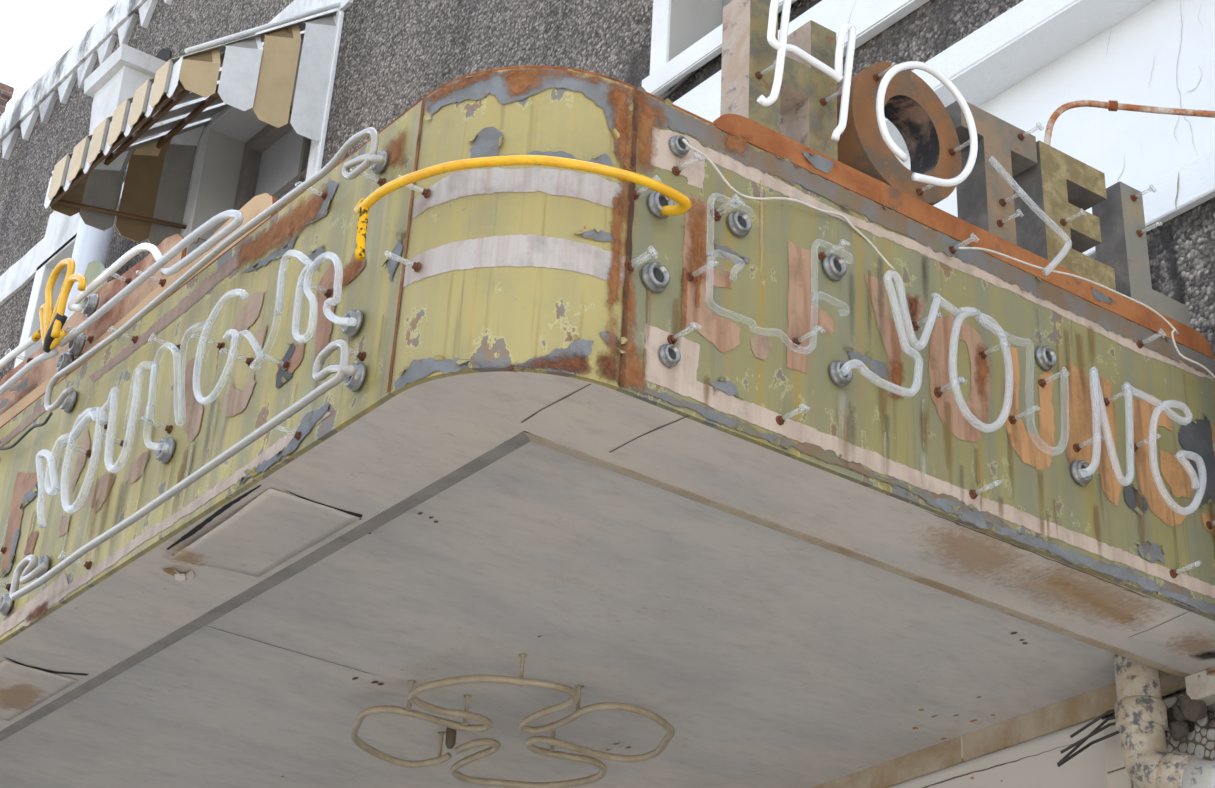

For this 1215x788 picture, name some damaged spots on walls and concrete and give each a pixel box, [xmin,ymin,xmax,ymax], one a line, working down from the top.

corrosion [427,68,667,389]
peeling [423,69,1215,380]
corrosion [907,297,918,323]
peeling [394,331,627,392]
peeling [20,484,38,509]
spalling [1165,693,1208,741]
crack [922,744,1072,788]